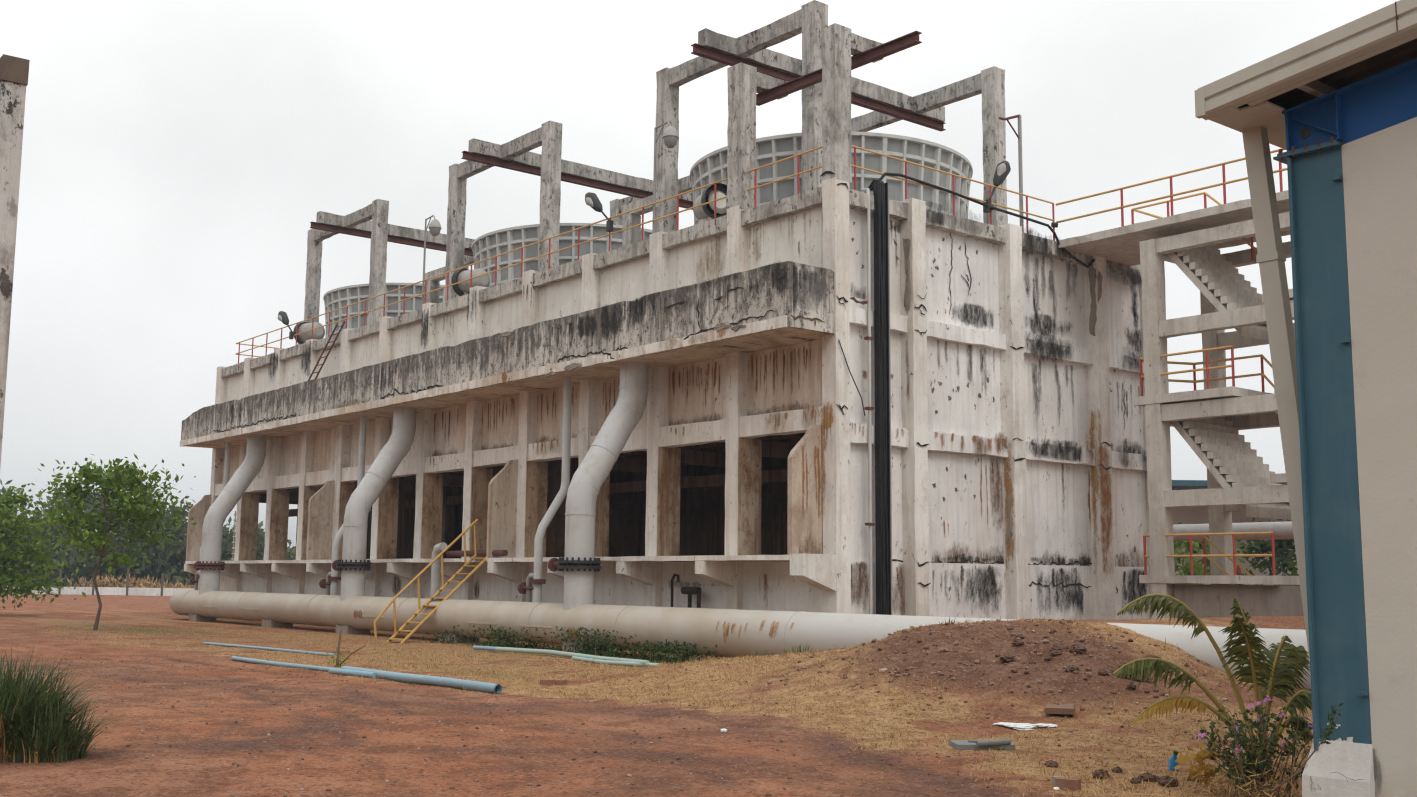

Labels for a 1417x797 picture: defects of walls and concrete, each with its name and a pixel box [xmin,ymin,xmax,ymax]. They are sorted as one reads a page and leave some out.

damp [552,294,666,346]
corrosion [669,322,832,435]
damp [750,244,823,306]
damp [1025,228,1077,418]
corrosion [747,403,833,516]
corrosion [935,432,1014,568]
corrosion [1043,412,1143,572]
corrosion [716,621,794,642]
damp [933,554,1002,610]